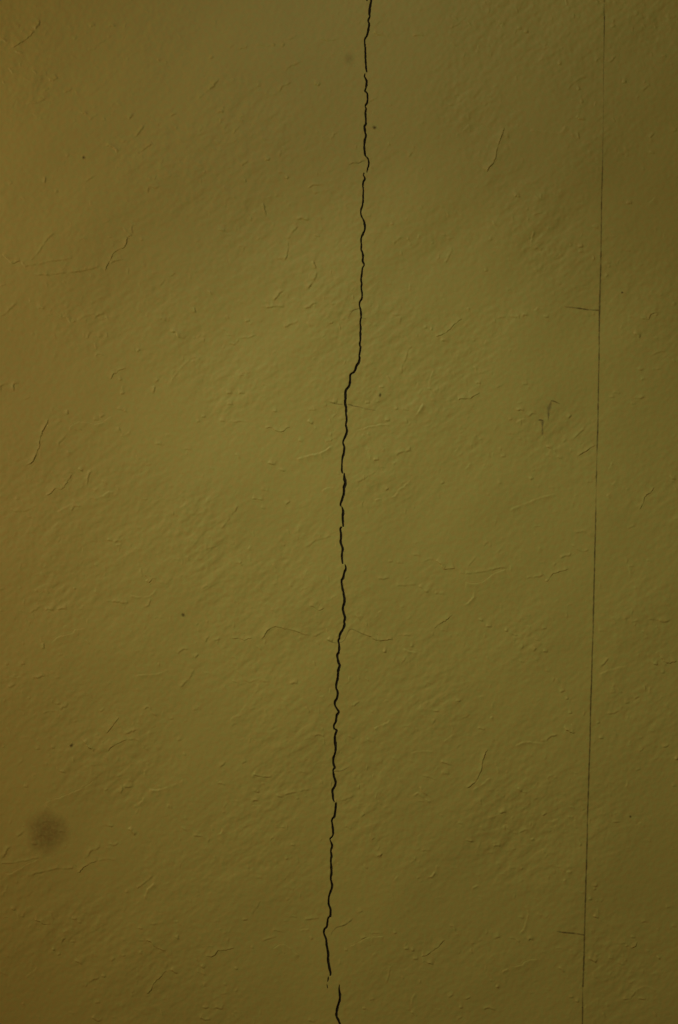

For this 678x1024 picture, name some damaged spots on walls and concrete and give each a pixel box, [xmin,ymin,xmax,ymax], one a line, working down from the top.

crack [323,0,372,1024]